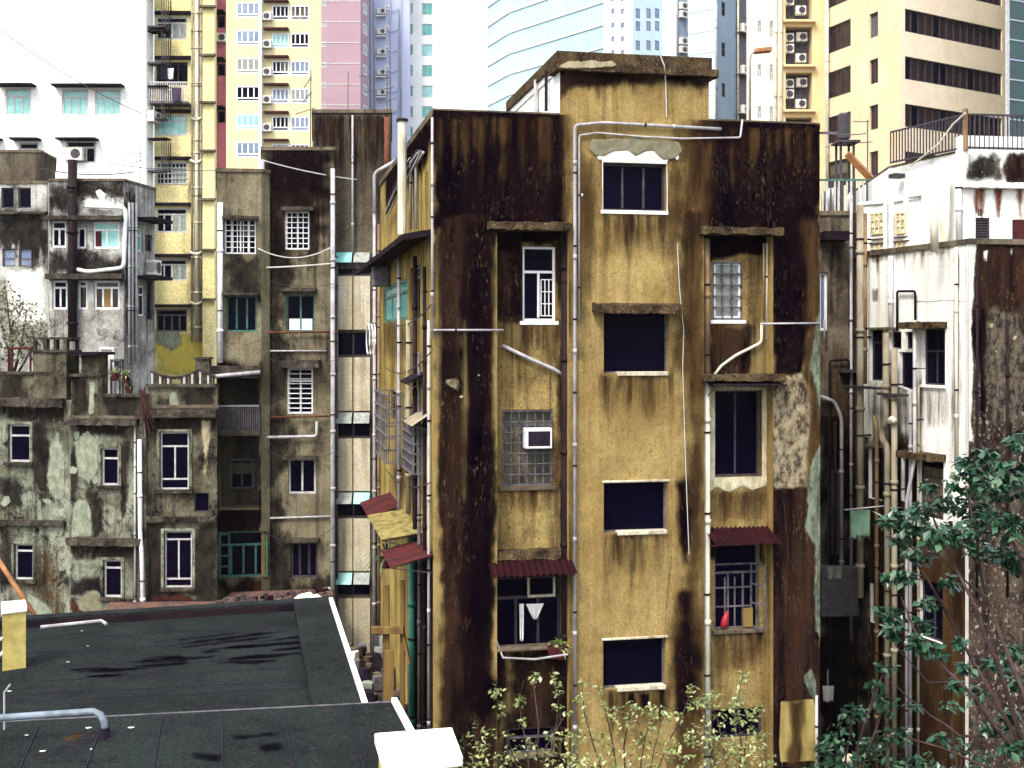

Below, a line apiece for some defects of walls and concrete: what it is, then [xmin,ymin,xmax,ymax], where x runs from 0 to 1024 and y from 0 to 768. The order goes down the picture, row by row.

water stain [966,152,1024,183]
rust [974,189,1002,216]
water stain [0,181,136,344]
peeling [155,332,181,351]
peeling [446,378,463,398]
water stain [417,114,854,768]
peeling [42,431,98,517]
peeling [27,594,52,615]